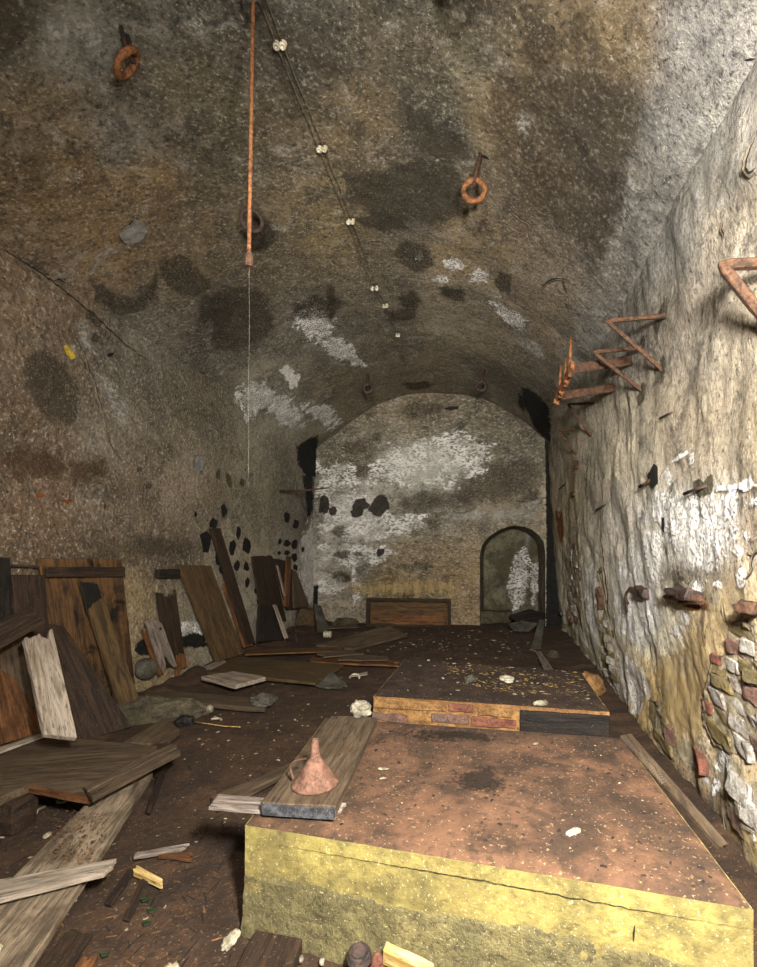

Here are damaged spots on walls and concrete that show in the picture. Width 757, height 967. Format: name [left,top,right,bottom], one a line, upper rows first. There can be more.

water stain [22,350,81,425]
crack [4,250,151,462]
water stain [89,248,273,352]
water stain [233,378,345,432]
water stain [292,286,367,367]
water stain [342,107,543,358]
water stain [484,12,640,287]
water stain [296,429,540,610]
water stain [606,468,757,747]
flaking render [647,618,757,841]